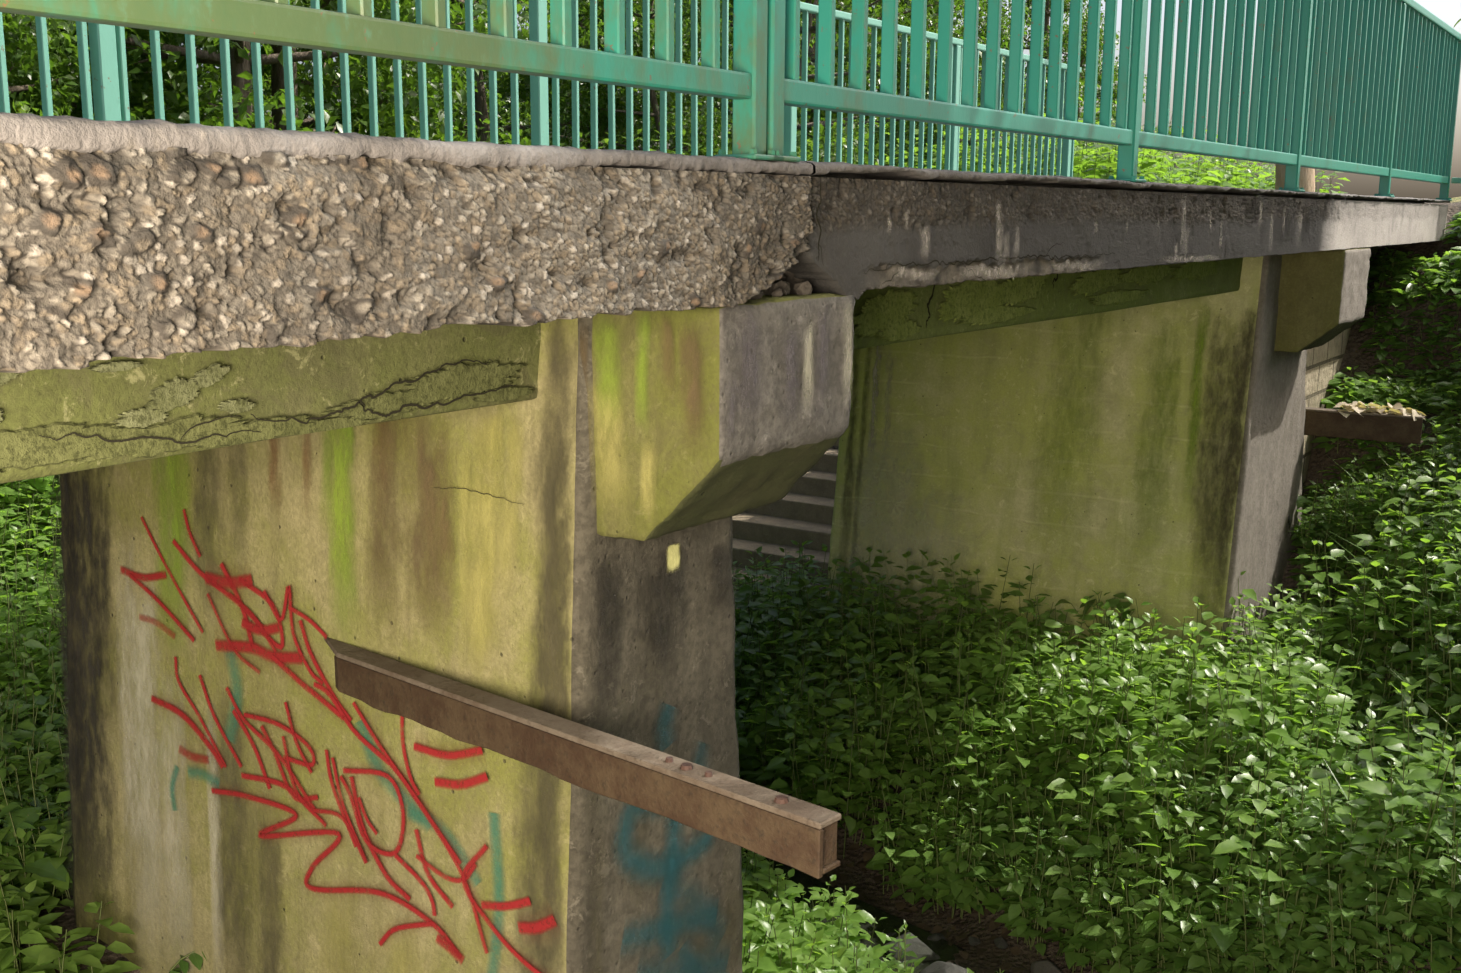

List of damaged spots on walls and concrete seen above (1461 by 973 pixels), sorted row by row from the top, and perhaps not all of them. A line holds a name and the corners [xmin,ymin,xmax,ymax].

crack [39,359,517,444]
leakage [325,427,353,585]
leakage [413,438,512,642]
leakage [537,330,619,718]
leakage [1189,326,1252,557]
leakage [58,470,110,863]
leakage [122,614,177,844]
leakage [211,729,277,953]
leakage [524,773,560,973]